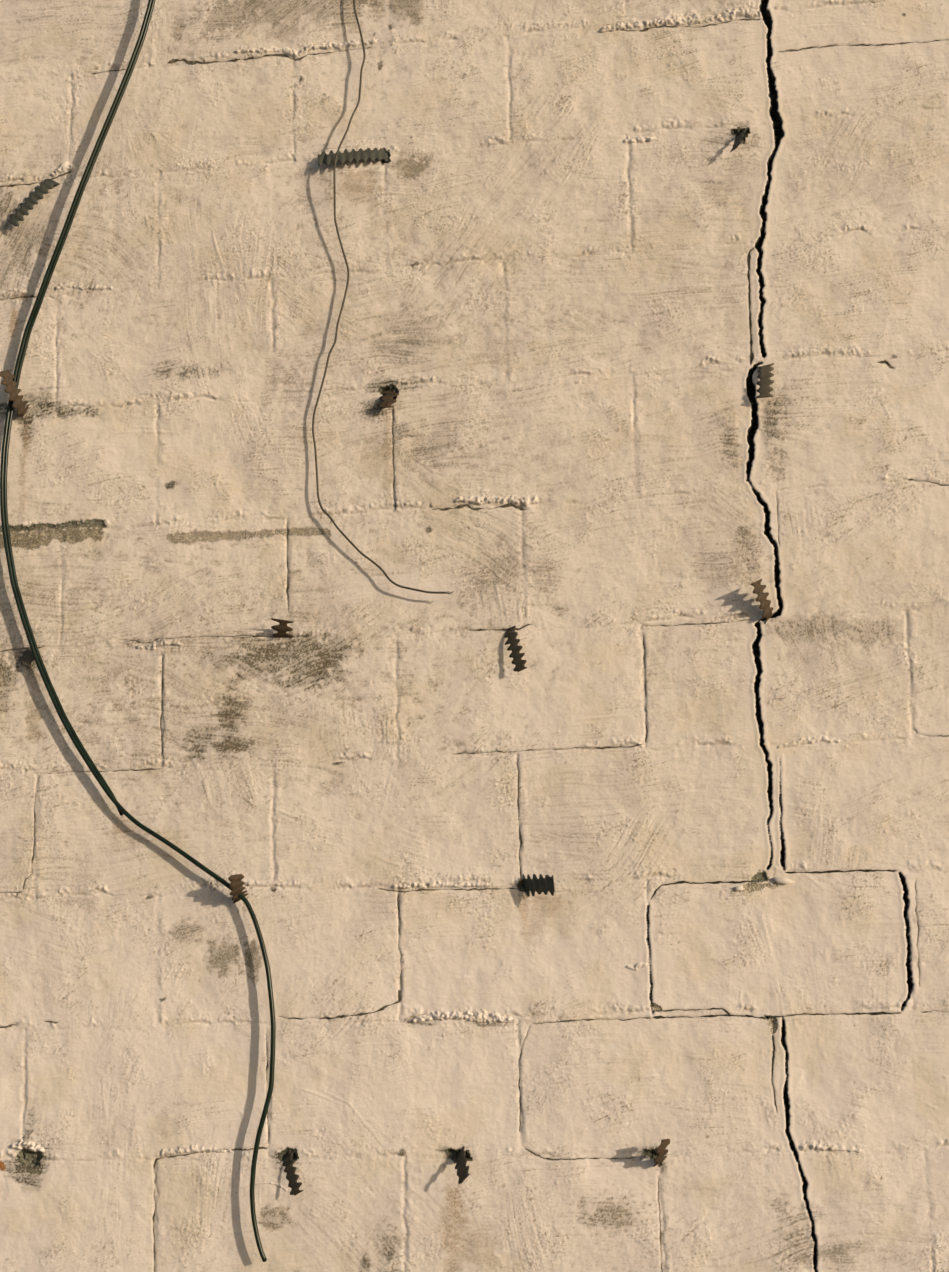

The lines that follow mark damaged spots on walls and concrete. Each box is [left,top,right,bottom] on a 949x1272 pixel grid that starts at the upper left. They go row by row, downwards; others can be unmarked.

damp [183,632,361,759]
crack [226,0,942,1272]